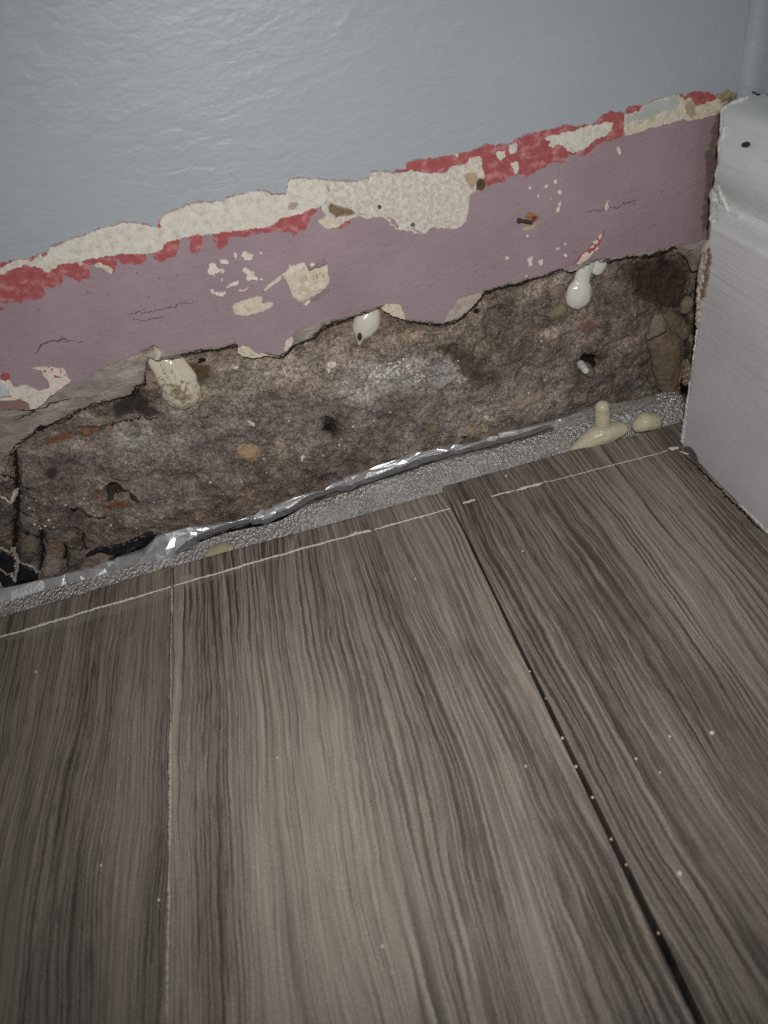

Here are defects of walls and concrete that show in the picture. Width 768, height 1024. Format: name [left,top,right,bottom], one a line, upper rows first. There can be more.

peeling [0,90,737,316]
crack [0,374,159,567]
flaking render [0,230,707,580]